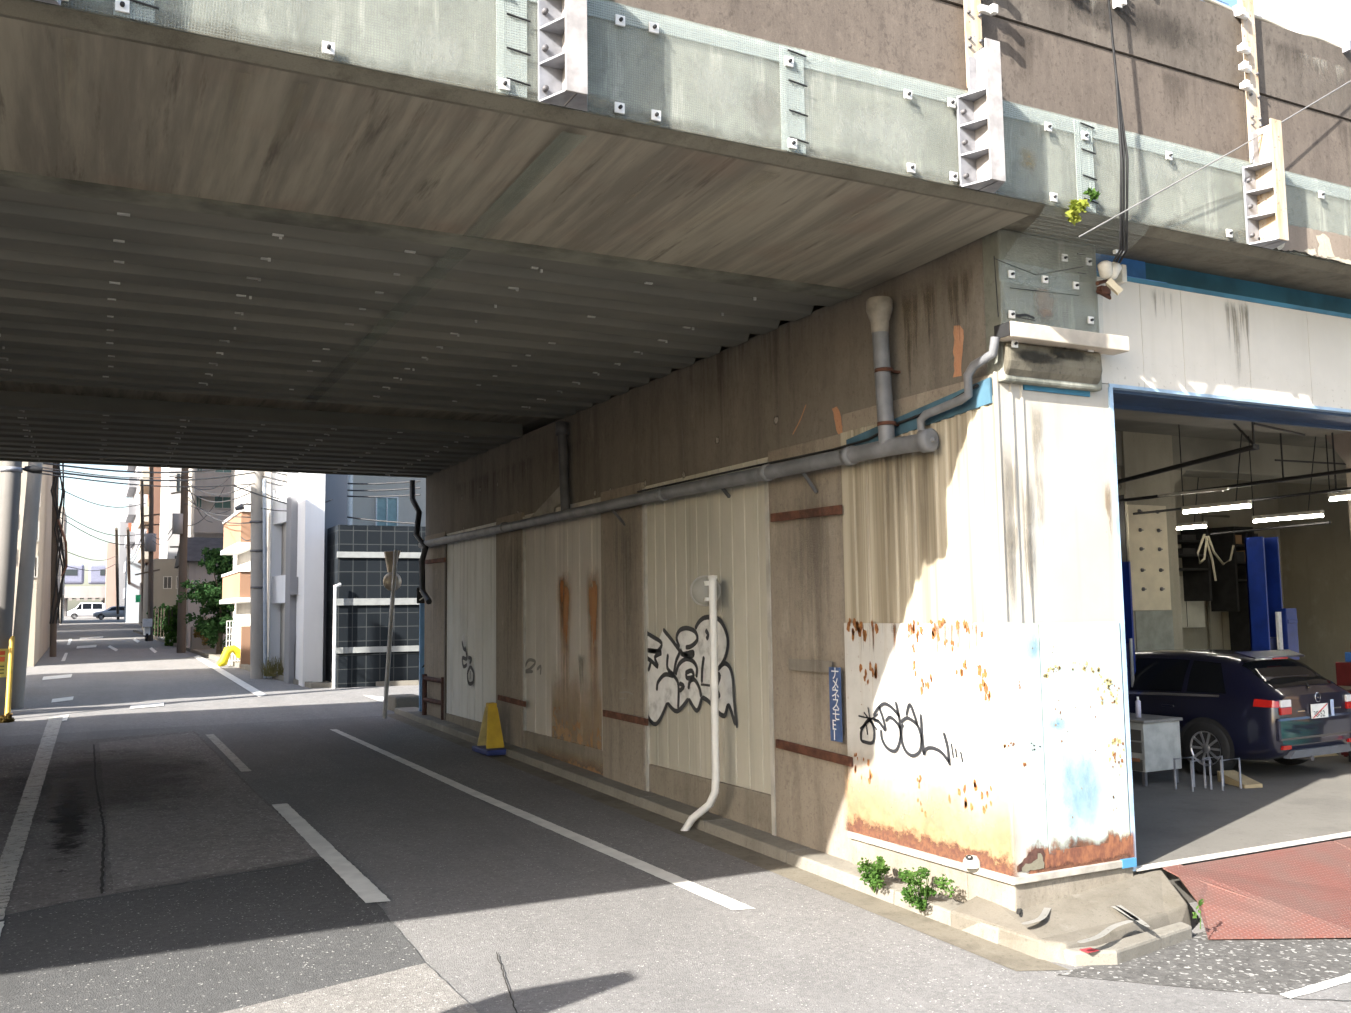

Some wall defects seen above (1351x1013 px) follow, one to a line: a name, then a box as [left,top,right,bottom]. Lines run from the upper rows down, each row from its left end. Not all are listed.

corrosion [847,617,991,702]